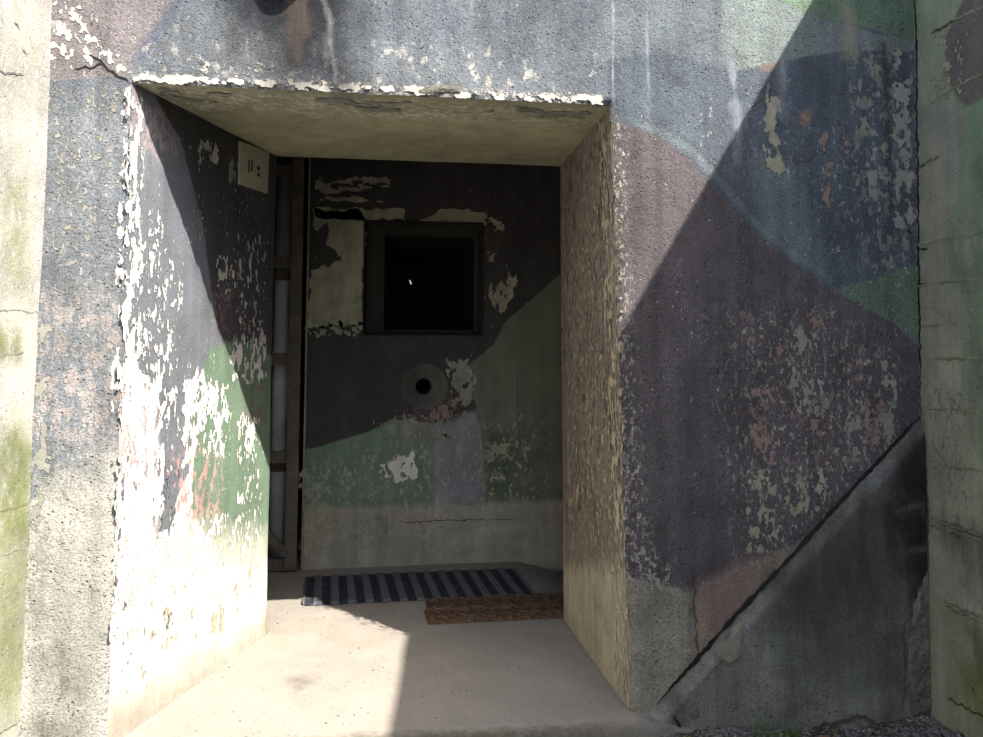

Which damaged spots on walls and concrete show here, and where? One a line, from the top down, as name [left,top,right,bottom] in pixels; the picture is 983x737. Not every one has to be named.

crack [74,55,129,83]
peeling [762,93,790,175]
peeling [819,132,834,208]
peeling [842,45,917,231]
peeling [42,0,677,708]
peeling [744,385,780,453]
peeling [785,308,898,462]
peeling [26,416,52,592]
peeling [746,461,830,553]